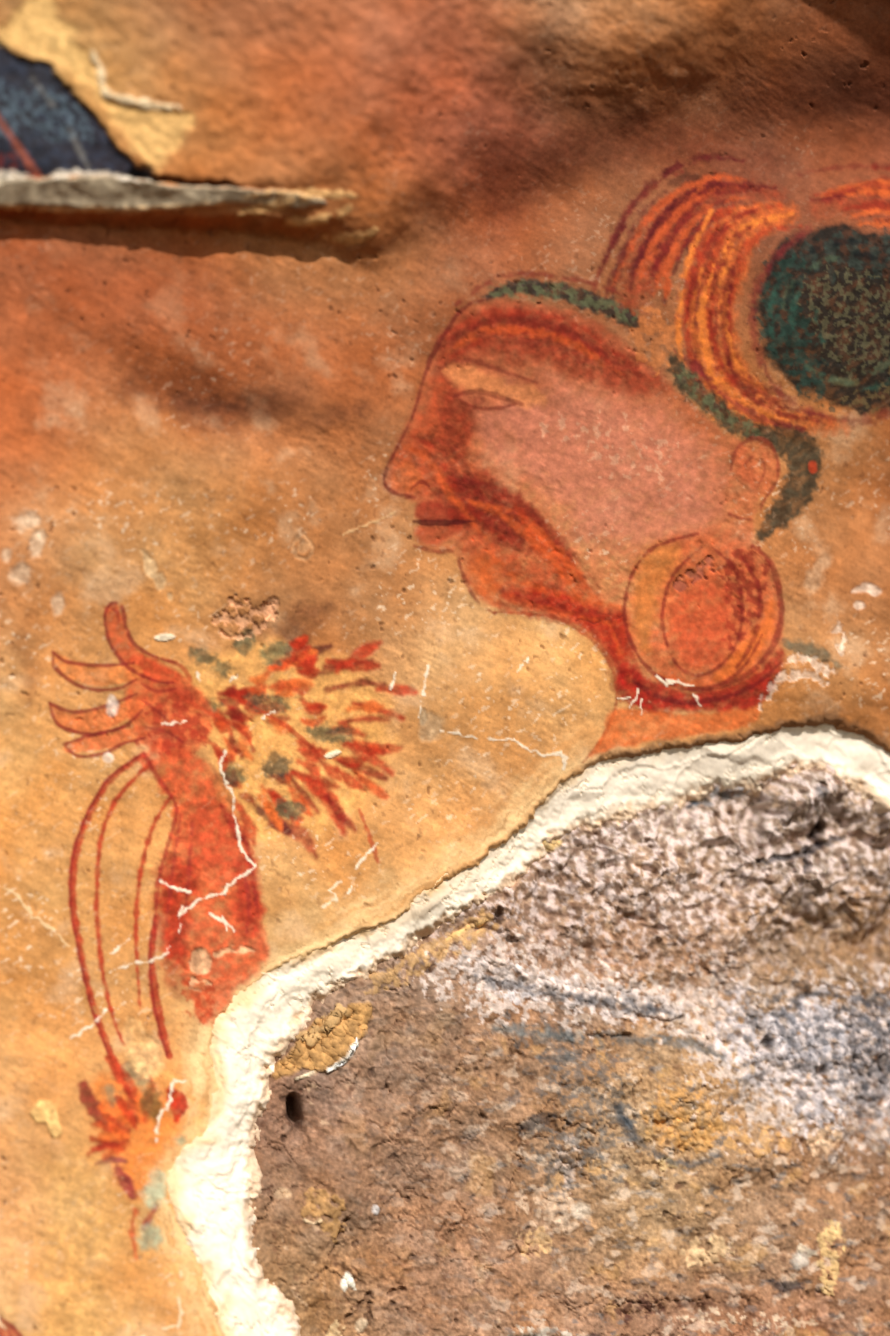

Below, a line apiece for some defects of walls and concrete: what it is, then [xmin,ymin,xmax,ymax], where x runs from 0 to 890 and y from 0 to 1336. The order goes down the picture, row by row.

peeling [0,0,380,247]
crack [194,670,239,683]
crack [160,718,188,726]
crack [260,709,278,720]
peeling [416,707,447,744]
spalling [323,749,342,760]
crack [109,749,379,974]
crack [0,884,71,947]
peeling [187,944,257,993]
crack [69,1006,108,1040]
spalling [251,764,890,1336]
crack [139,1296,184,1336]